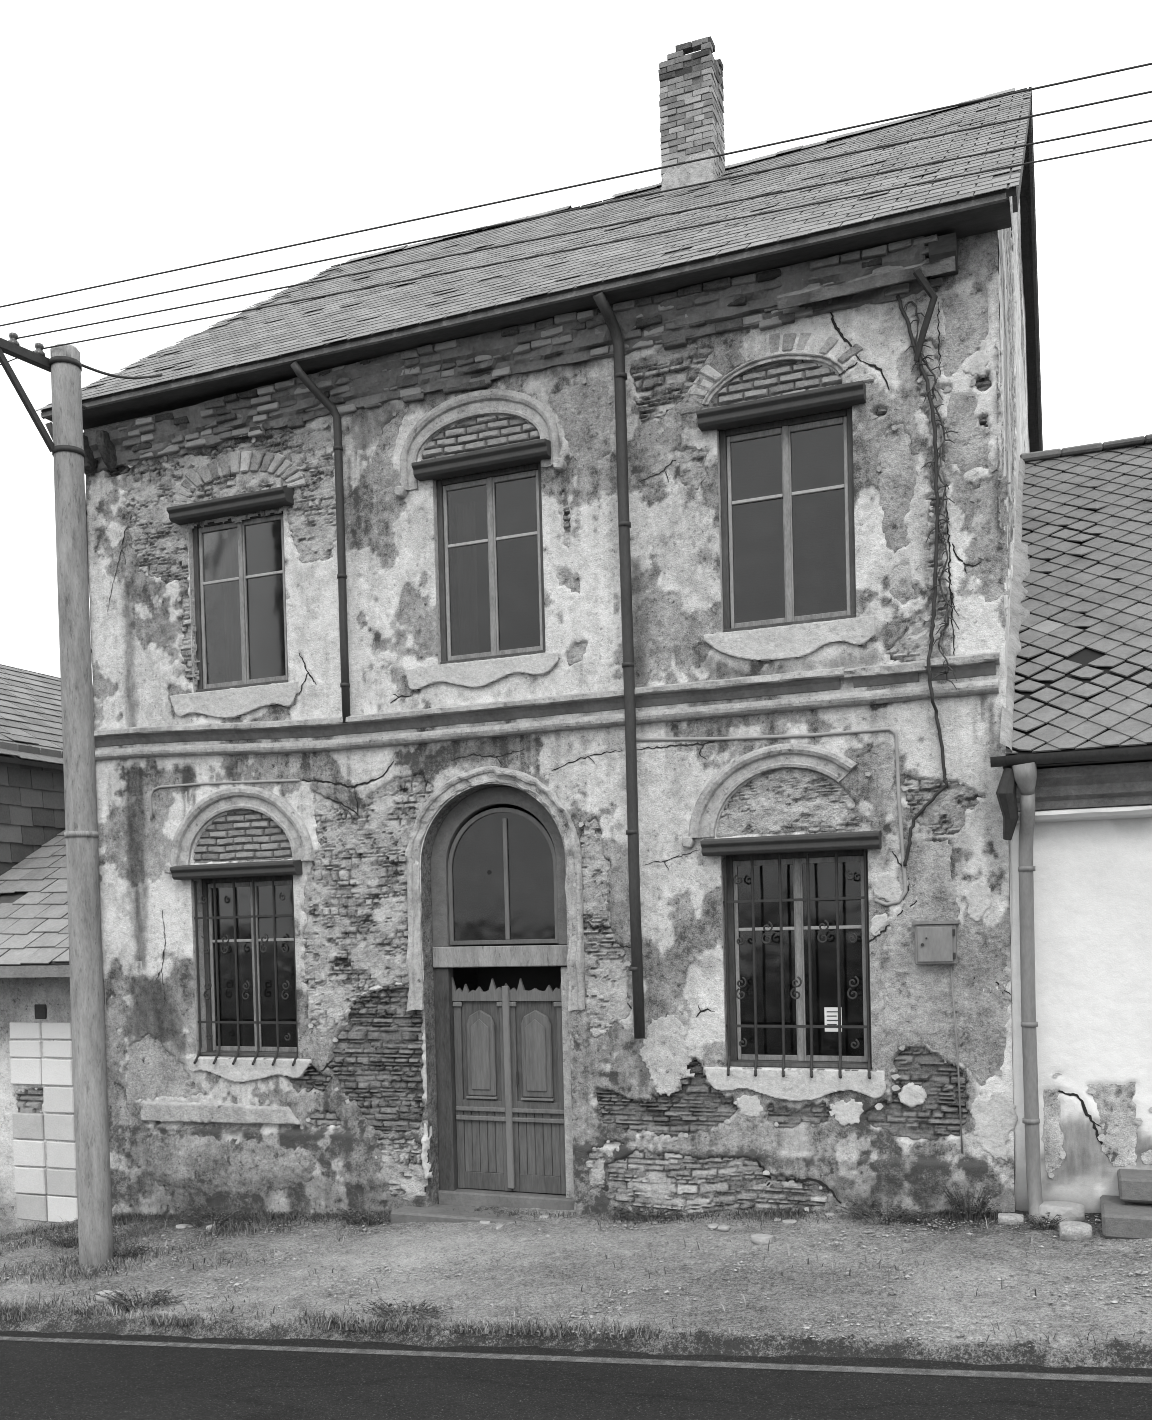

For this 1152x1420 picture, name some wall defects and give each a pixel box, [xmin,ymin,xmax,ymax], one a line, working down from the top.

crack [830,312,890,390]
spalling [123,423,337,685]
crack [302,761,394,815]
spalling [285,773,433,1201]
flaking render [857,744,1013,1141]
spalling [585,1058,836,1214]
flaking render [1041,1074,1066,1179]
crack [1058,1090,1110,1154]
flaking render [1087,1082,1152,1167]